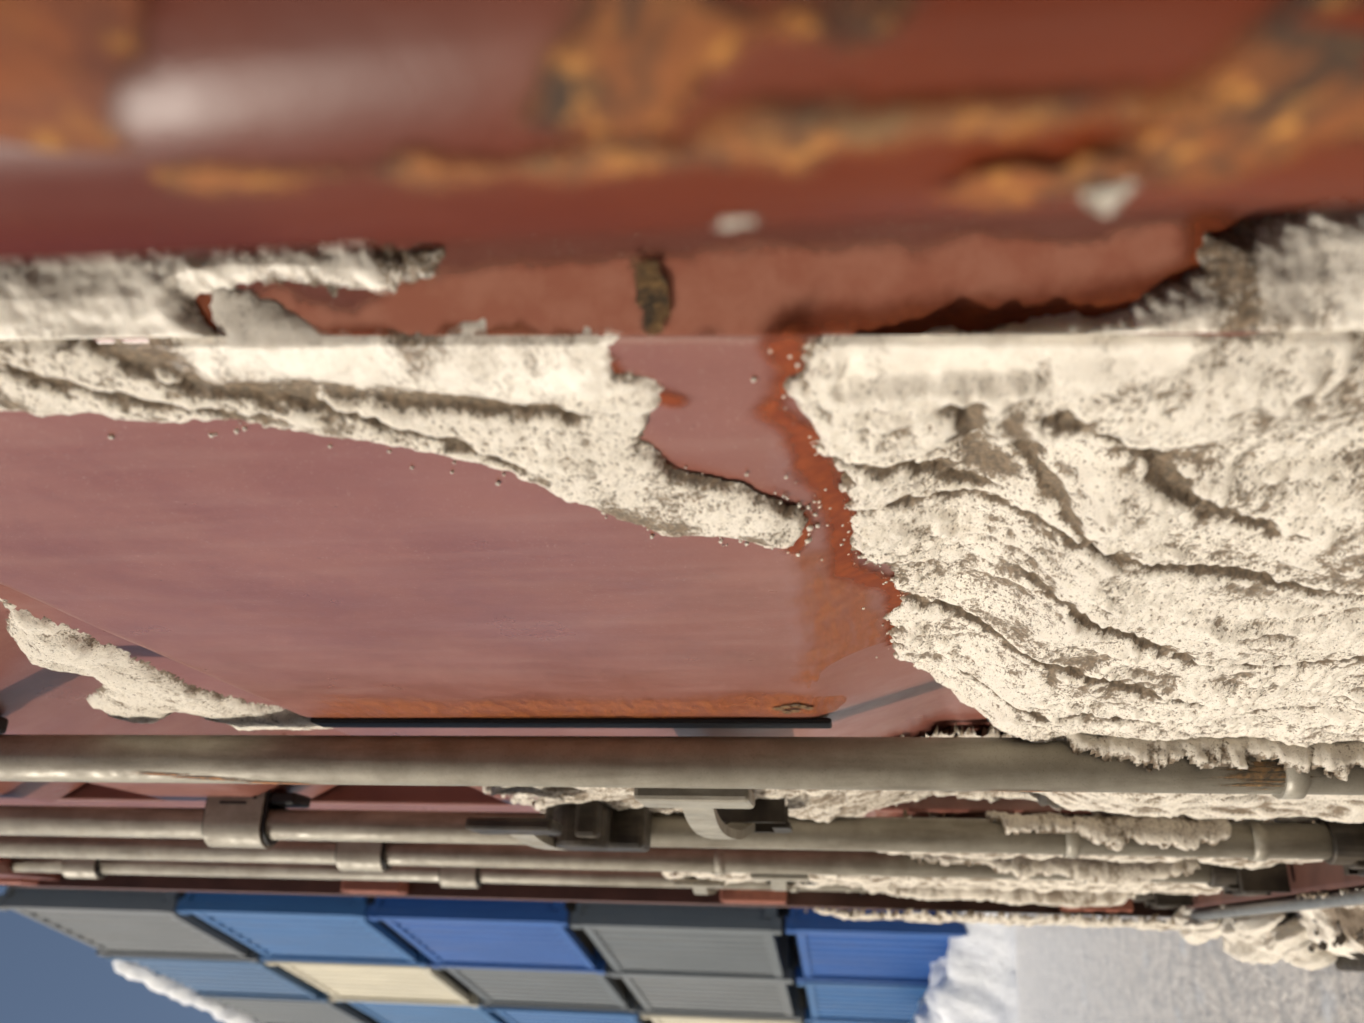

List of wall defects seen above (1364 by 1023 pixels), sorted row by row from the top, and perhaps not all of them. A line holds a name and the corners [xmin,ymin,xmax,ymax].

rust [0,0,141,153]
rust [376,0,1089,187]
rust [1106,0,1364,188]
rust [155,164,341,195]
rust [258,223,1188,335]